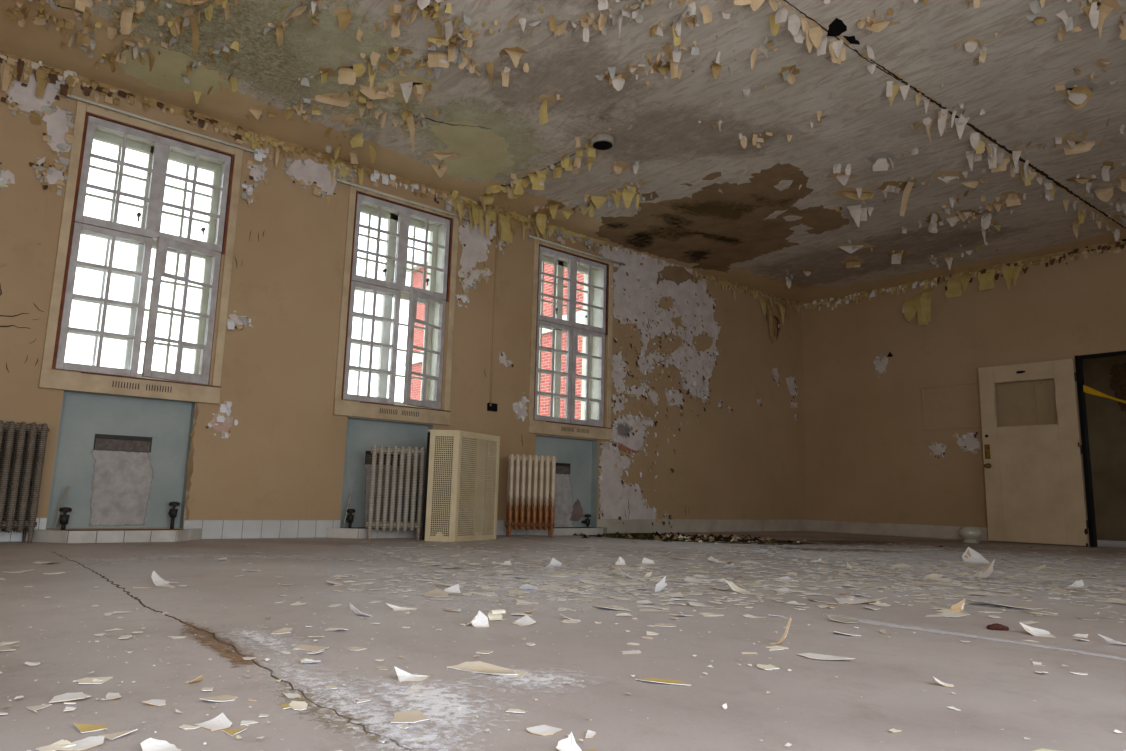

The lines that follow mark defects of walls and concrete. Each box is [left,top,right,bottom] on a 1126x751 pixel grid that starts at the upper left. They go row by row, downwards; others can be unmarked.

crack [0,284,44,372]
peeling [0,0,1126,528]
crack [52,552,414,751]